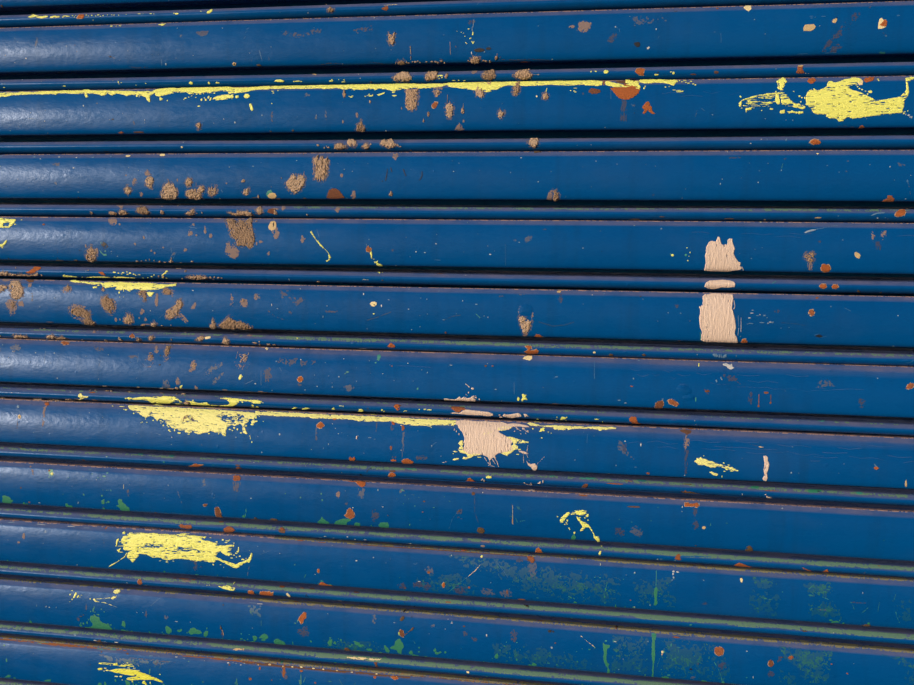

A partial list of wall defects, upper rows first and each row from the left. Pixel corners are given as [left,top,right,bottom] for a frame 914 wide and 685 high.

corrosion [589,68,645,100]